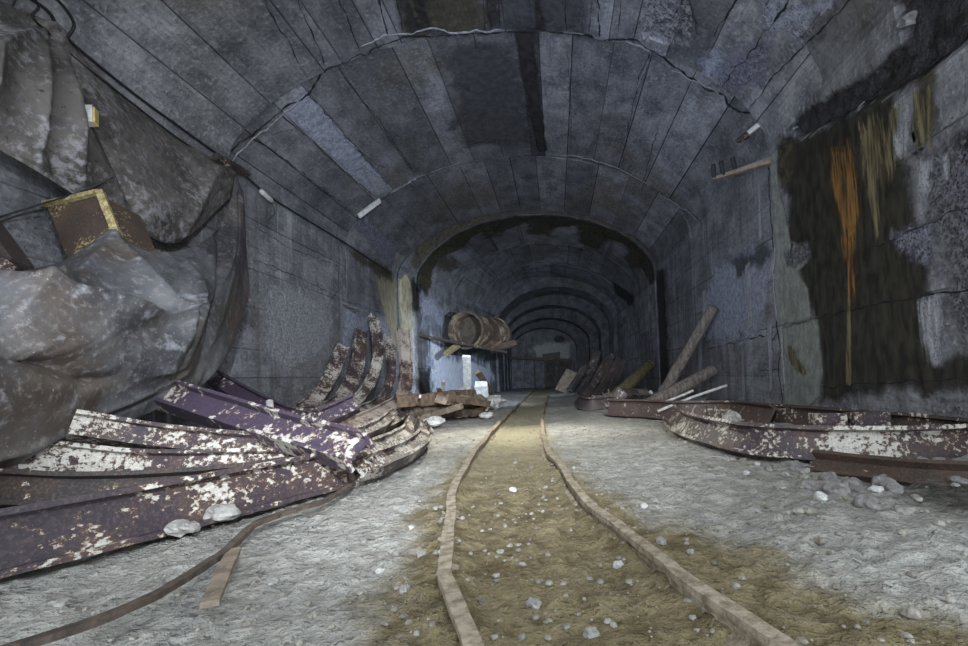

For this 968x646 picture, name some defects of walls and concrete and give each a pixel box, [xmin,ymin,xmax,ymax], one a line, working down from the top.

water stain [399,0,588,152]
crack [230,0,849,338]
crack [708,166,968,404]
rust [831,107,899,386]
water stain [778,70,968,400]
spalling [792,0,968,134]
rust [913,85,932,150]